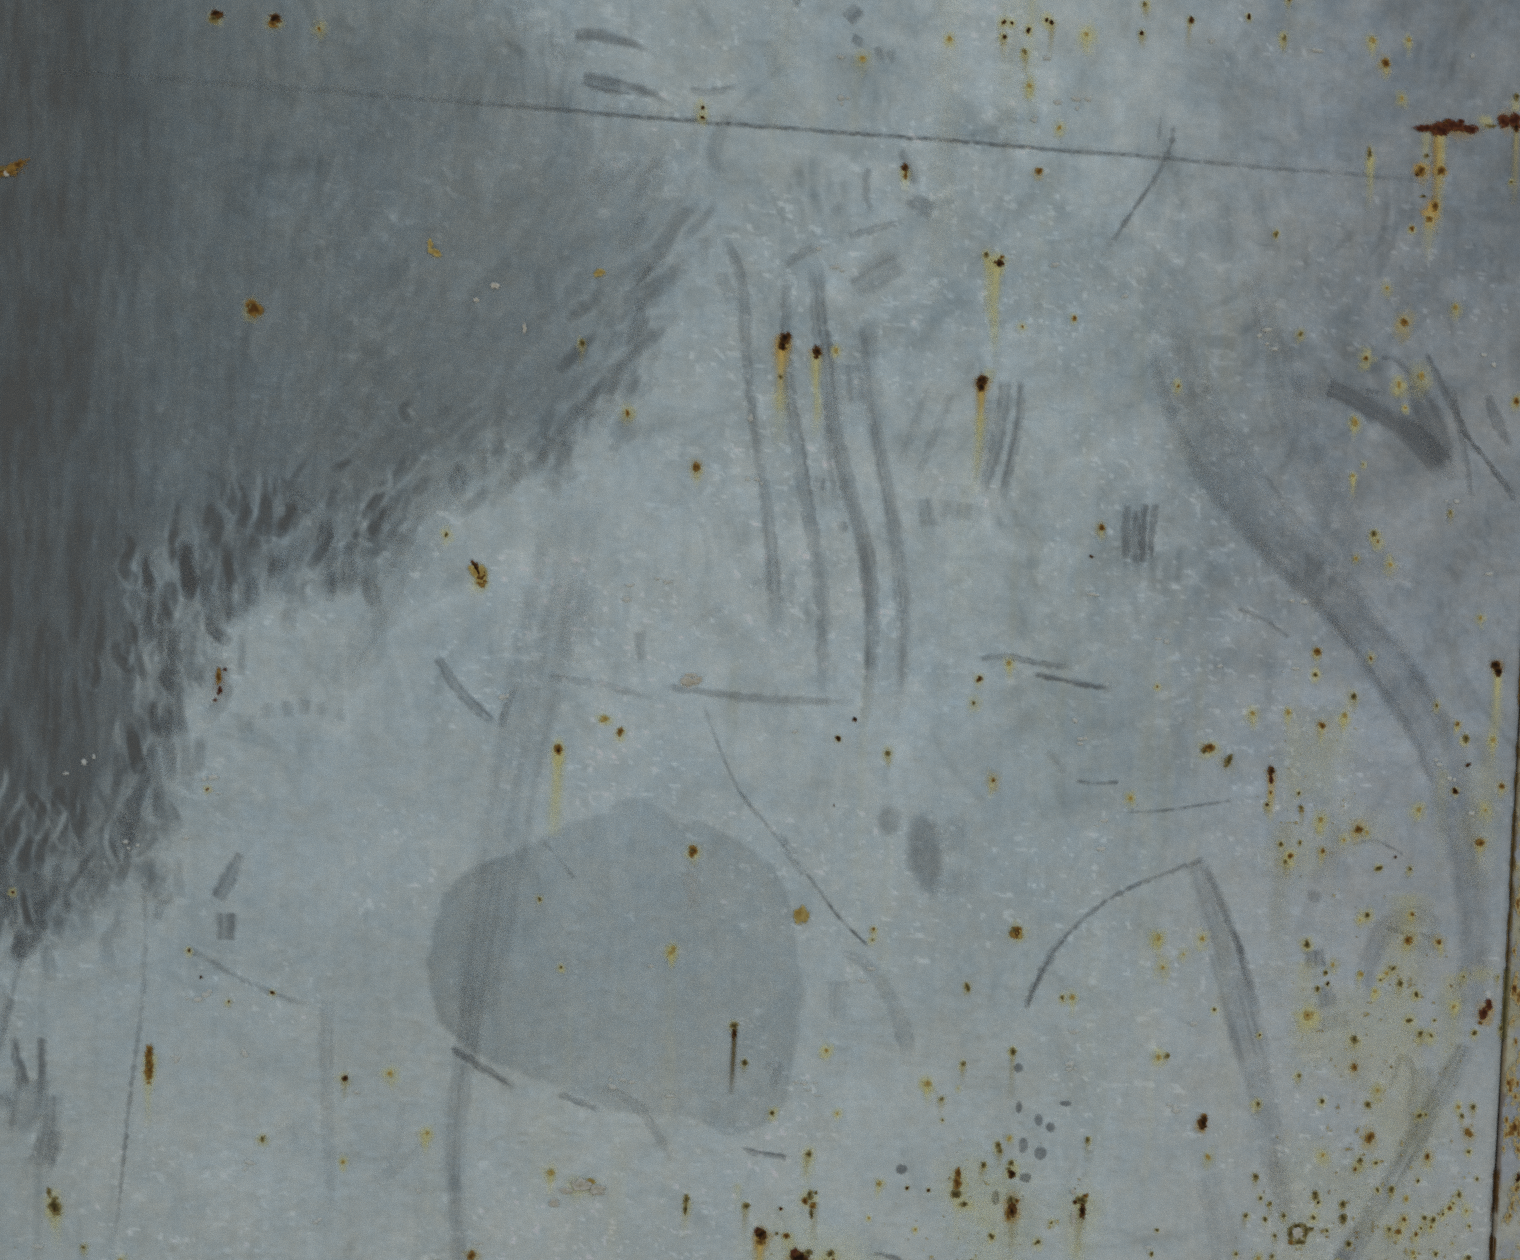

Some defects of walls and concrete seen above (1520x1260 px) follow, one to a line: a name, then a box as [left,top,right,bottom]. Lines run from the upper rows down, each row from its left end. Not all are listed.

rust [1000,17,1054,57]
rust [1414,93,1520,176]
rust [777,332,791,385]
rust [976,375,988,427]
rust [1491,661,1520,704]
rust [730,1022,748,1077]
rust [1471,810,1520,1260]
rust [951,1167,968,1207]
rust [982,1135,1019,1221]
rust [1073,1193,1088,1220]
rust [1244,1174,1353,1260]
rust [1375,1178,1471,1256]